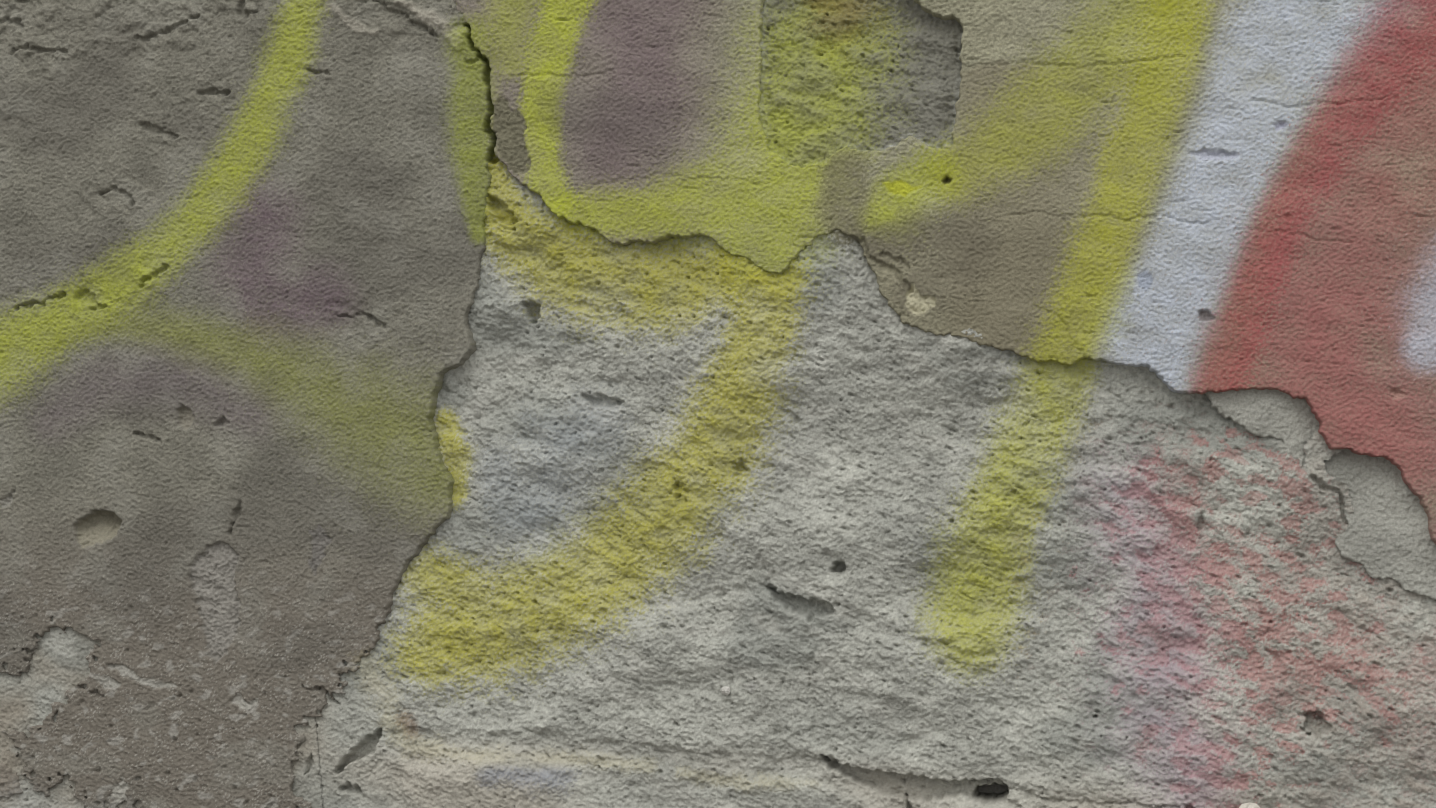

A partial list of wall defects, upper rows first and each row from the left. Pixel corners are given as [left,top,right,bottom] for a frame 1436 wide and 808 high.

crack [454,0,614,164]
spalling [856,0,963,151]
spalling [16,290,108,311]
spalling [140,264,170,287]
spalling [133,431,160,442]
spalling [75,510,123,548]
spalling [292,236,1436,808]
spalling [189,501,242,667]
spalling [0,617,177,808]
spalling [231,693,259,712]
crack [821,754,1177,808]